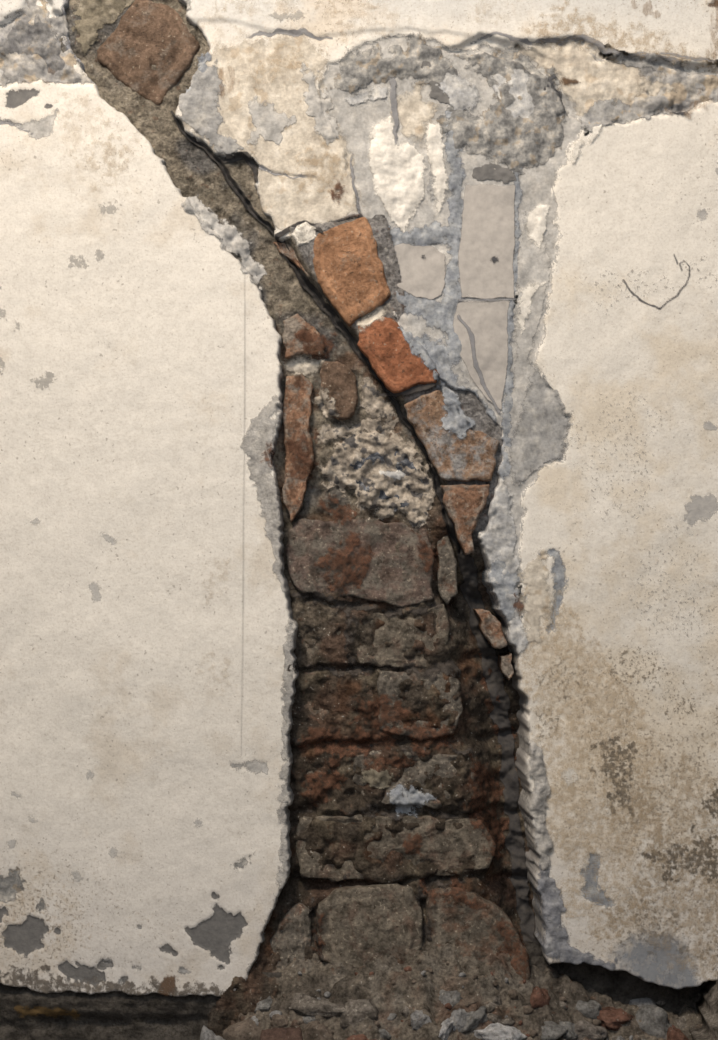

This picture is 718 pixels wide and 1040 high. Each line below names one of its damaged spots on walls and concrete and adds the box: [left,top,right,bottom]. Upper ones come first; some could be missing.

crack [471,31,714,62]
crack [623,256,690,309]
flaking render [0,0,531,1039]
crack [171,111,536,941]
flaking render [318,33,718,971]
water stain [609,646,695,715]
water stain [590,734,638,824]
water stain [698,778,718,818]
water stain [641,825,718,886]
water stain [615,899,718,988]